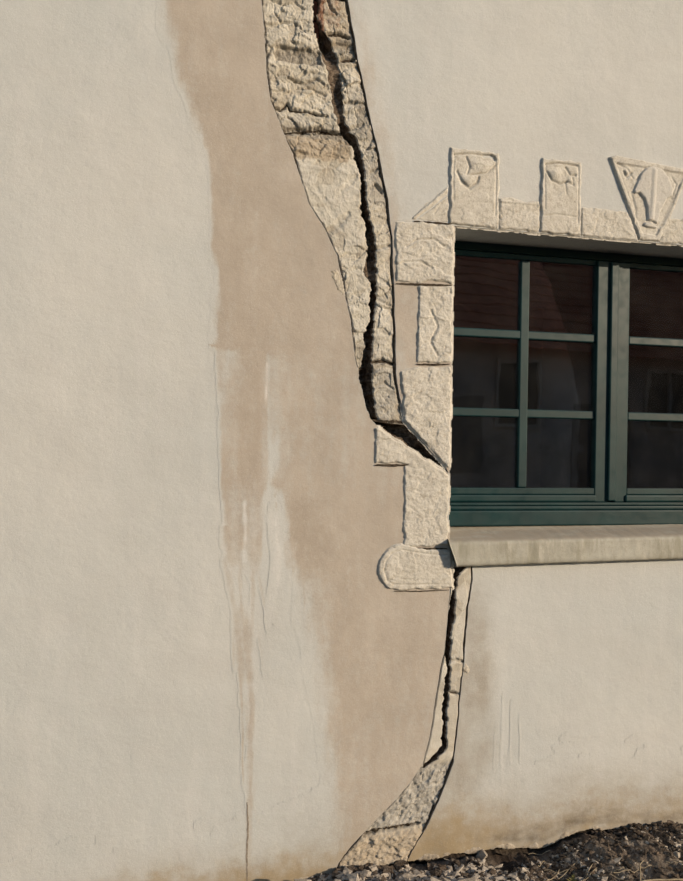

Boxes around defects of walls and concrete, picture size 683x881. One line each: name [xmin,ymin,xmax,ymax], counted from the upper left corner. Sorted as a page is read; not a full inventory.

damp [155,0,454,852]
flaking render [262,0,404,425]
crack [264,0,447,471]
flaking render [339,561,472,869]
crack [337,567,606,868]